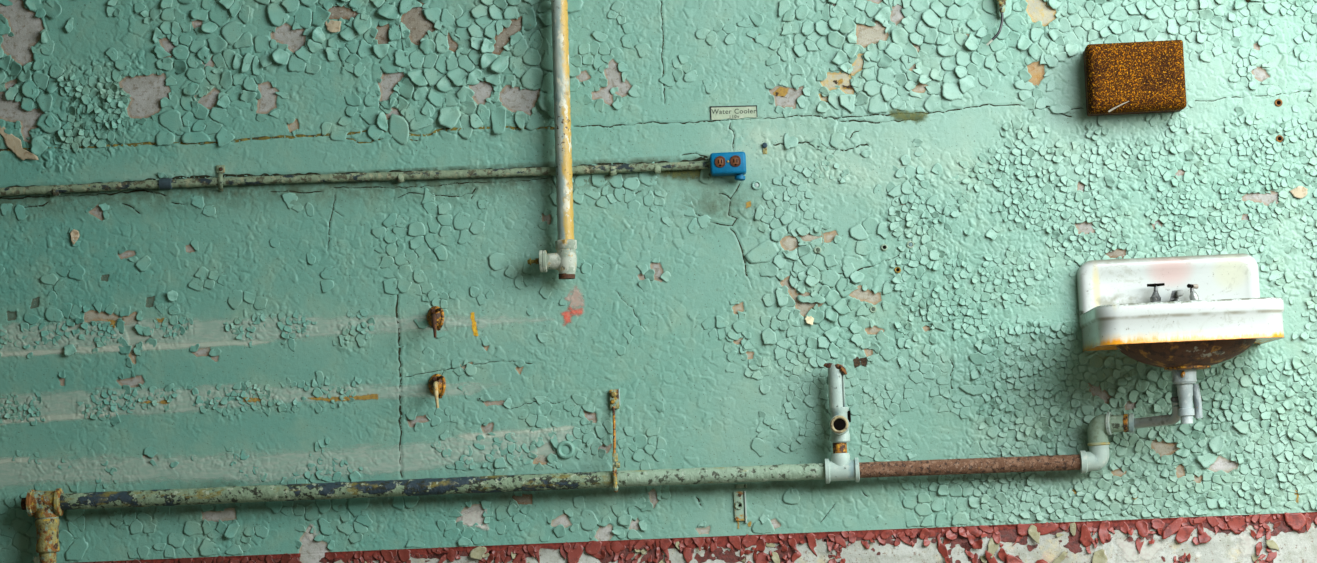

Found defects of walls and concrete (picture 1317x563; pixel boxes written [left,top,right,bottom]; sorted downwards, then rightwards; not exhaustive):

peeling [69,225,81,247]
peeling [0,264,362,426]
flaking render [0,0,554,160]
peeling [372,187,494,360]
crack [396,288,532,477]
crack [0,2,1084,245]
flaking render [569,1,651,113]
peeling [572,162,711,234]
peeling [659,55,717,94]
peeling [59,346,1317,563]
crack [695,182,748,276]
peeling [699,87,1317,462]